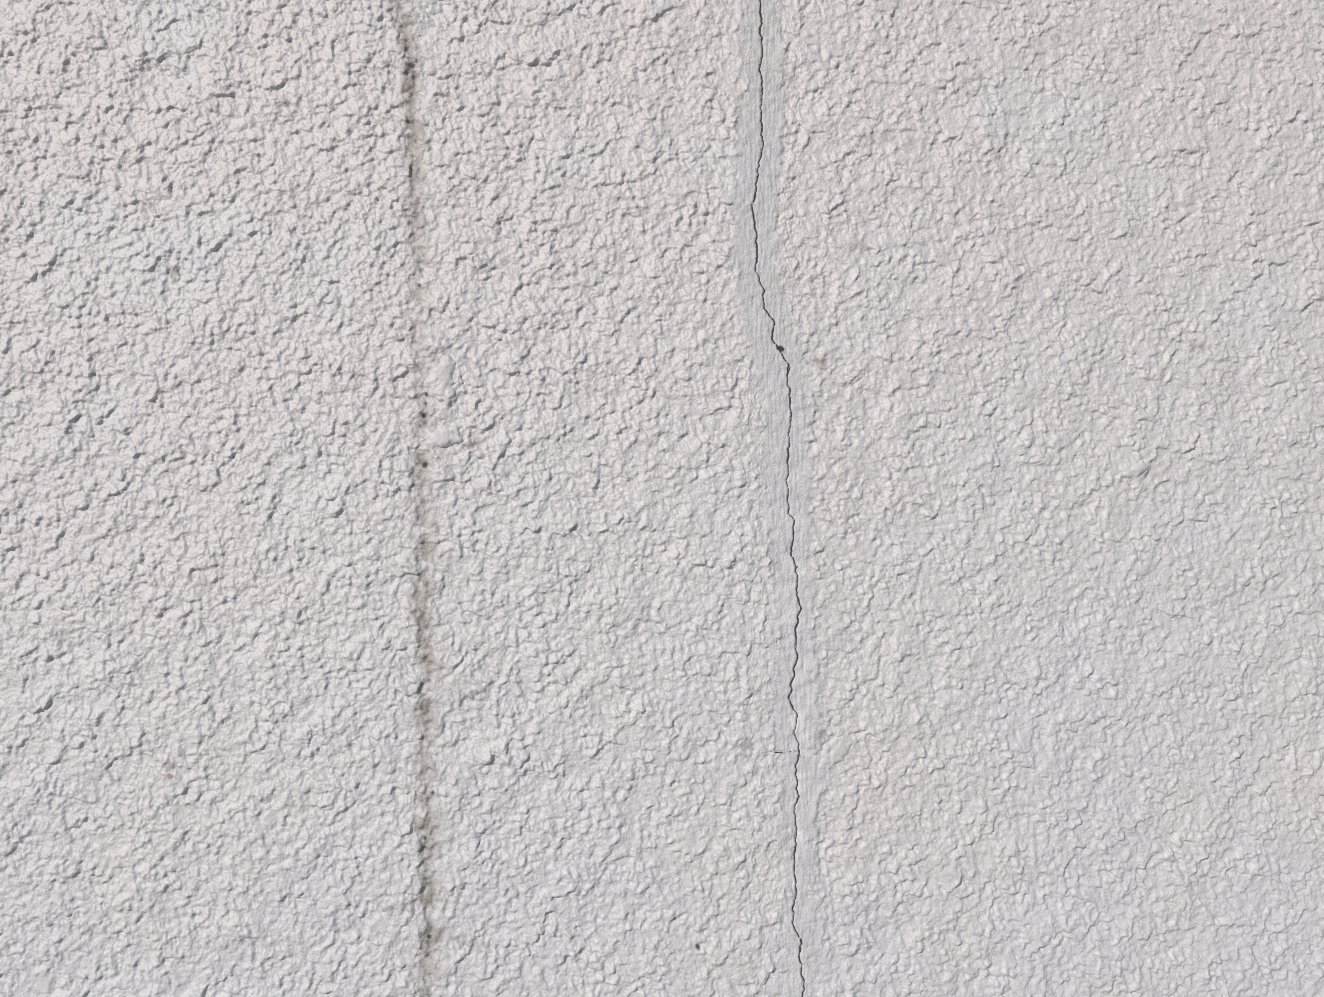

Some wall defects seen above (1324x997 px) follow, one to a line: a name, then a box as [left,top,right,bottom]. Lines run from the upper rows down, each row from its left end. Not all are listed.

crack [752,0,805,997]